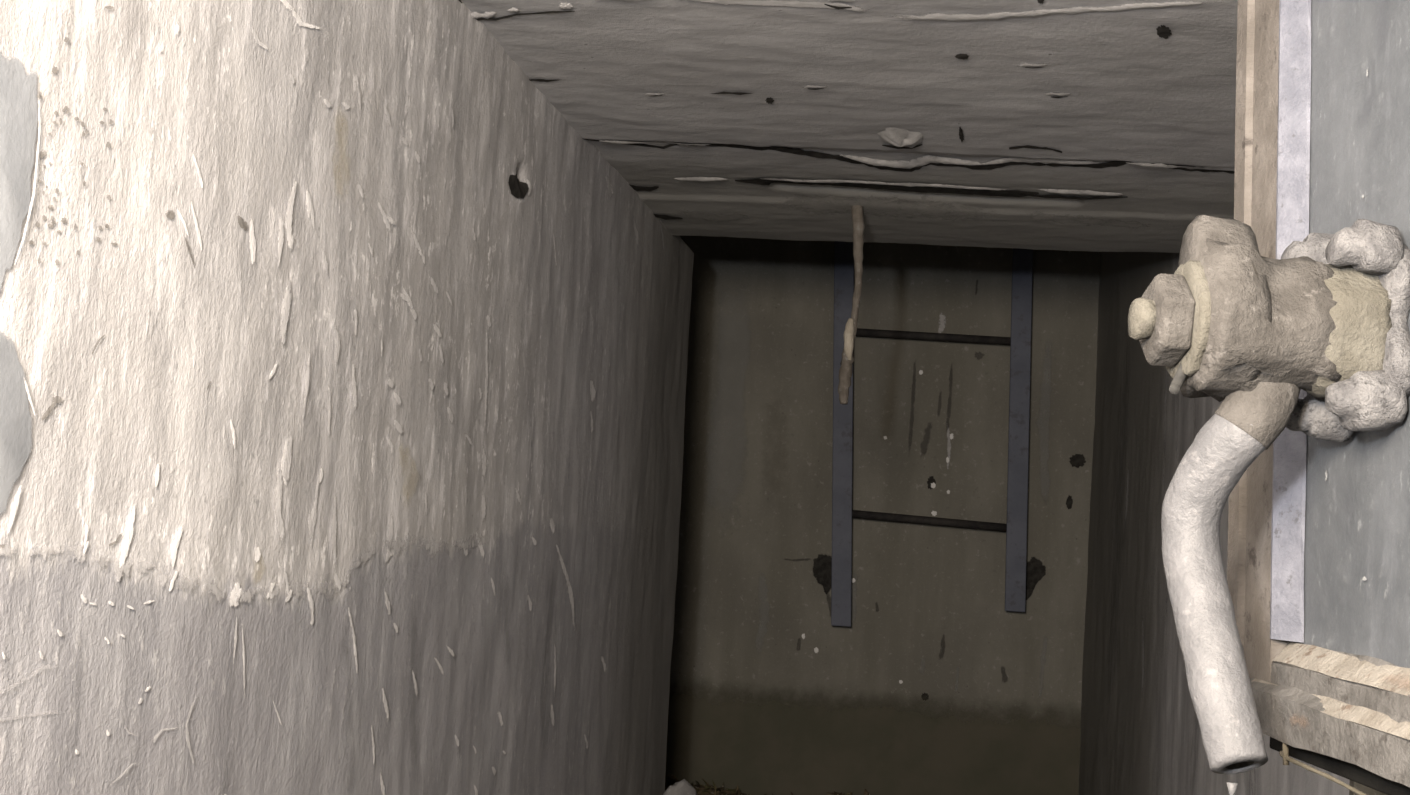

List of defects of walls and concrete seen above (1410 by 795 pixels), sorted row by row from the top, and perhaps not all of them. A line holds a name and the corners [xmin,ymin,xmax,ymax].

peeling [0,53,113,290]
crack [586,139,1235,174]
damp [277,181,315,266]
damp [280,280,291,346]
damp [119,505,135,568]
damp [274,435,292,541]
damp [308,468,341,590]
damp [80,594,155,610]
damp [233,593,245,698]
damp [269,571,314,626]
damp [348,607,358,673]
damp [665,687,1081,795]